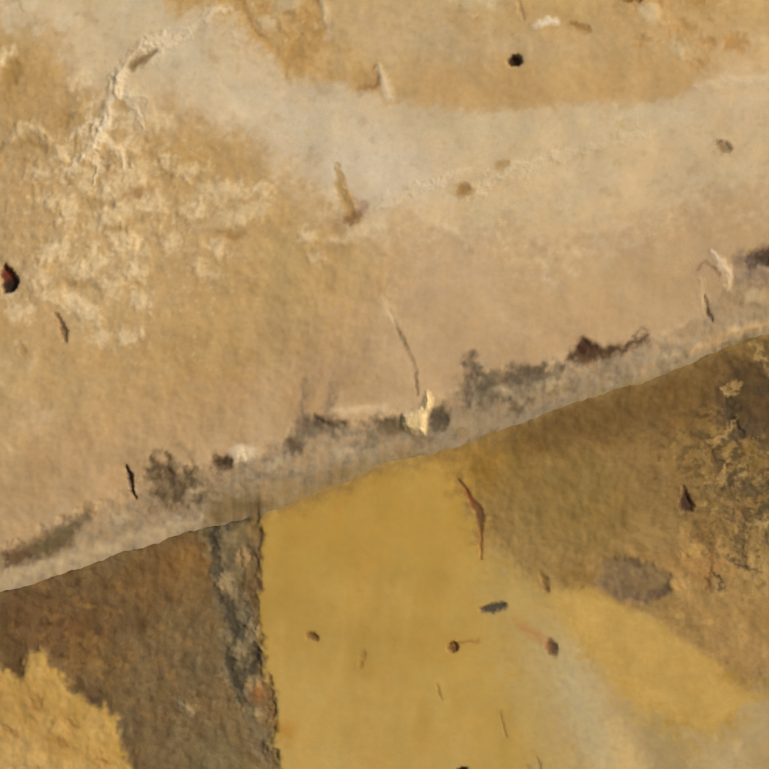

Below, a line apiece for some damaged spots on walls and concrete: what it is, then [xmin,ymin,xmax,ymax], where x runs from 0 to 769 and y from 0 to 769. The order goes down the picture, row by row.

peeling [0,521,286,769]
flaking render [226,441,292,476]
leakage [0,150,769,567]
peeling [439,430,519,550]
leakage [450,354,769,769]
peeling [515,334,769,686]